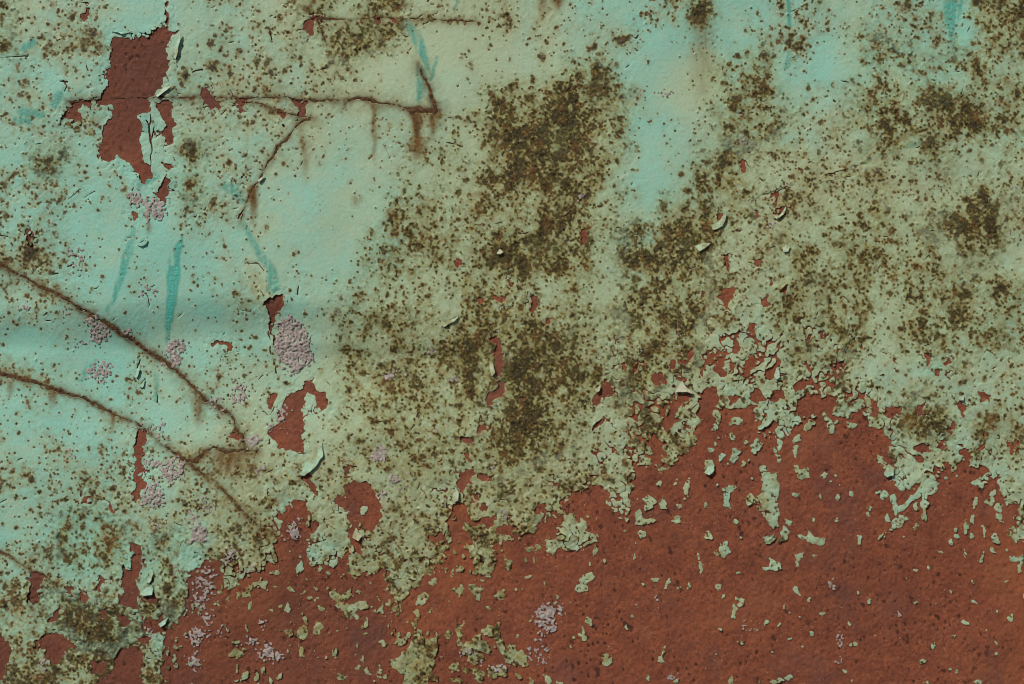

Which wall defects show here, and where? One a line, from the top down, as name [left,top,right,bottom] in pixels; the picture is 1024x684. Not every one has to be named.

peeling [60,1,181,204]
corrosion [746,0,1024,385]
corrosion [328,40,800,493]
corrosion [891,394,958,451]
peeling [90,323,1024,684]
peeling [26,572,46,605]
peeling [64,575,107,606]
peeling [0,634,12,683]
peeling [35,605,77,665]